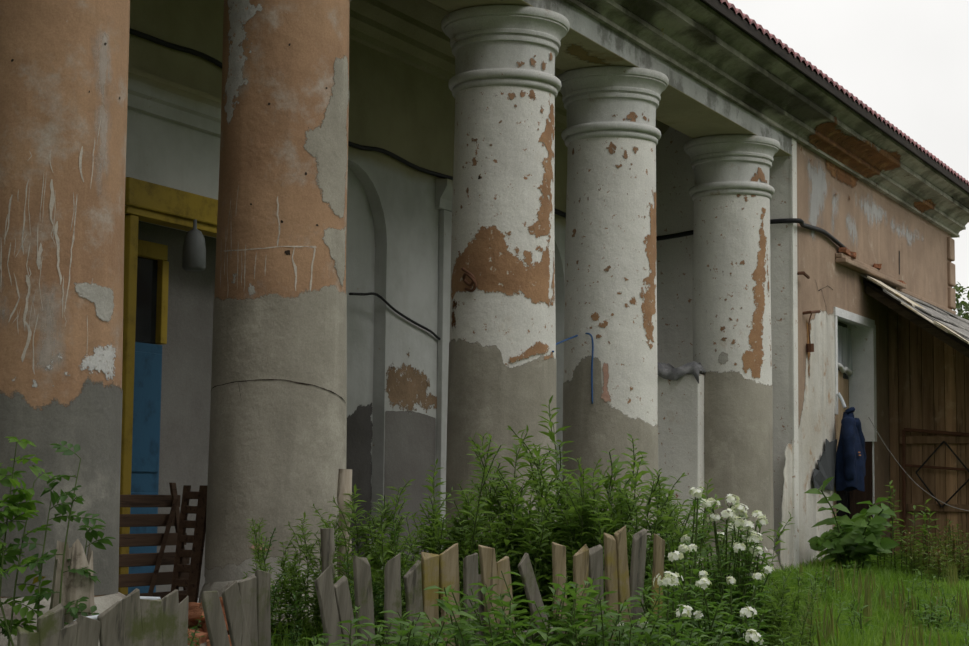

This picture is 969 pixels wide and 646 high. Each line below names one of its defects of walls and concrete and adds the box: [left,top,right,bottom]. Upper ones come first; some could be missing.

peeling [224,0,263,124]
peeling [451,90,555,306]
peeling [606,142,638,170]
peeling [751,167,767,183]
flaking render [799,116,910,236]
flaking render [74,282,114,322]
peeling [617,191,657,349]
peeling [715,207,772,379]
peeling [79,344,116,380]
crack [211,379,346,403]
flaking render [385,352,437,413]
peeling [505,341,554,366]